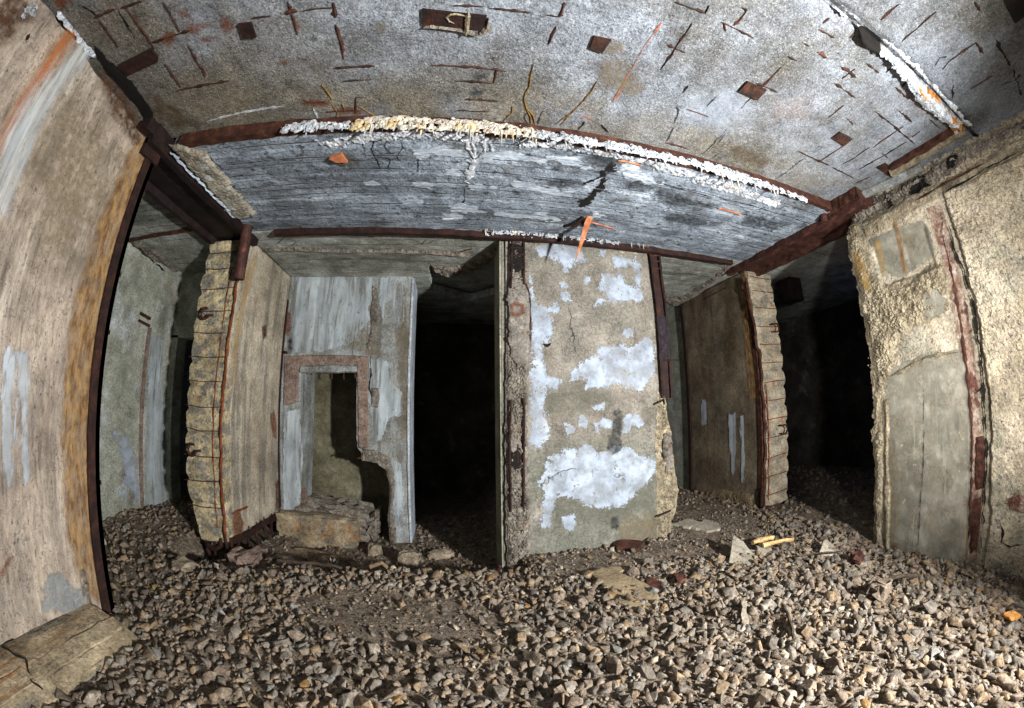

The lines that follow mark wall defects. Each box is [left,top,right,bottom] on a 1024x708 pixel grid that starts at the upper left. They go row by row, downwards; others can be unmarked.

rust [19,31,75,104]
spalling [169,144,258,219]
crack [362,140,419,172]
leakage [280,64,808,228]
crack [577,162,629,207]
leakage [879,38,972,130]
rust [62,139,145,601]
peeling [283,276,404,544]
spalling [430,241,679,570]
spalling [847,120,1024,549]
rust [863,139,1024,559]